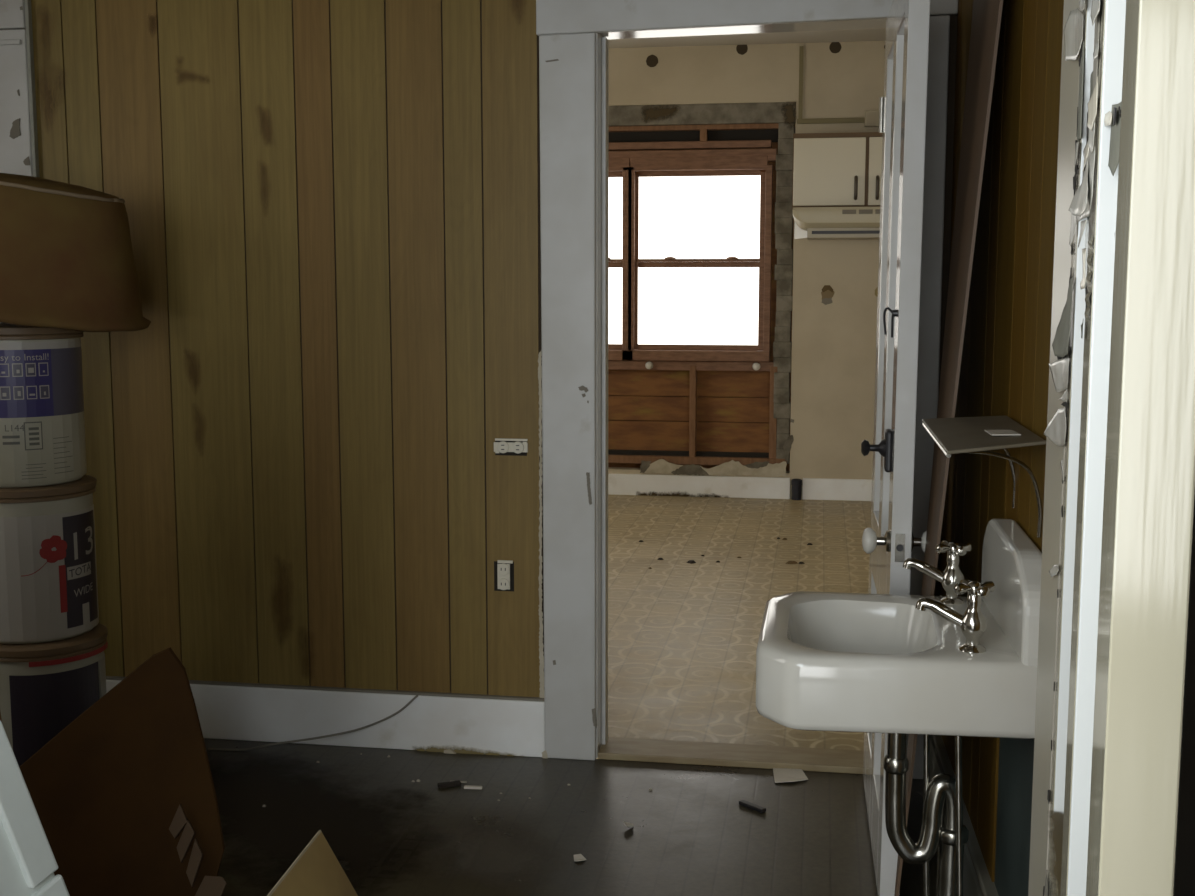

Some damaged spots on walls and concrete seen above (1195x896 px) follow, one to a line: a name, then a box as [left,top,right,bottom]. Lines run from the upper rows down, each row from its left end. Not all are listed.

peeling [1043,0,1122,446]
spalling [640,419,794,477]